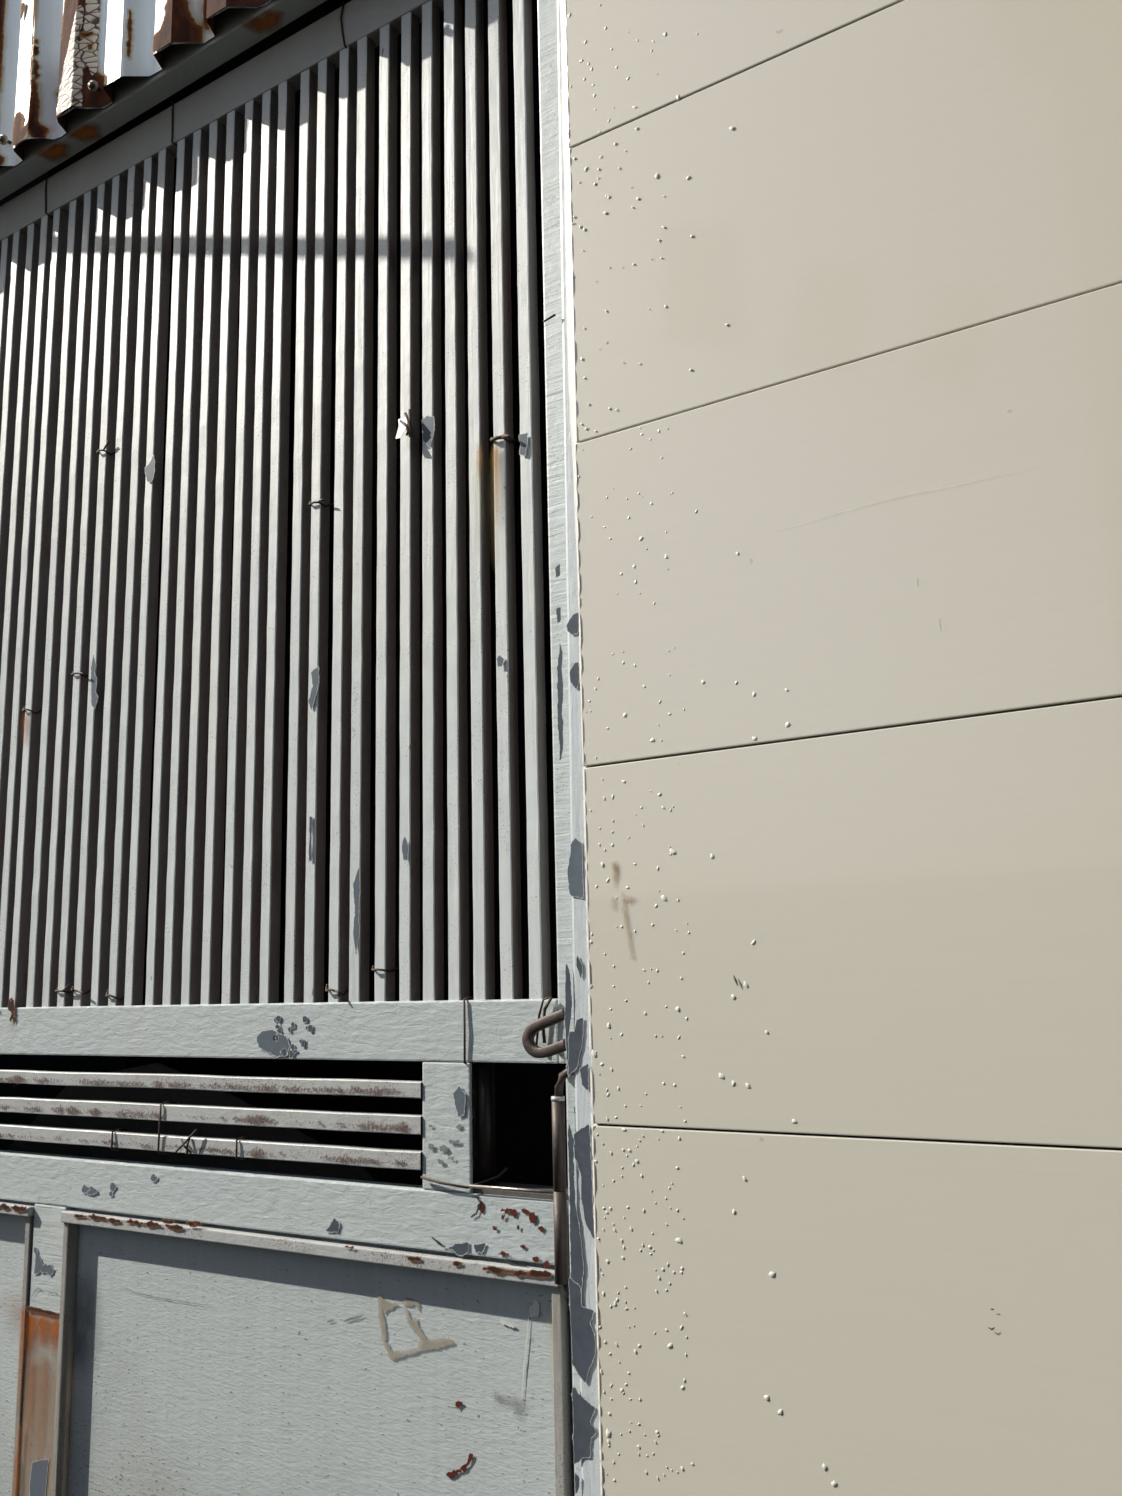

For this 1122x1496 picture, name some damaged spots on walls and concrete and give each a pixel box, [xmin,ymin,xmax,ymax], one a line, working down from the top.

rust [153,0,280,53]
rust [0,0,112,165]
rust [478,448,498,483]
peeling [555,270,602,1495]
peeling [256,1015,313,1058]
rust [0,1074,404,1096]
rust [1,1104,408,1133]
rust [0,1133,302,1158]
rust [320,1154,405,1167]
rust [0,1203,26,1213]
rust [477,1201,551,1278]
rust [20,1306,60,1369]